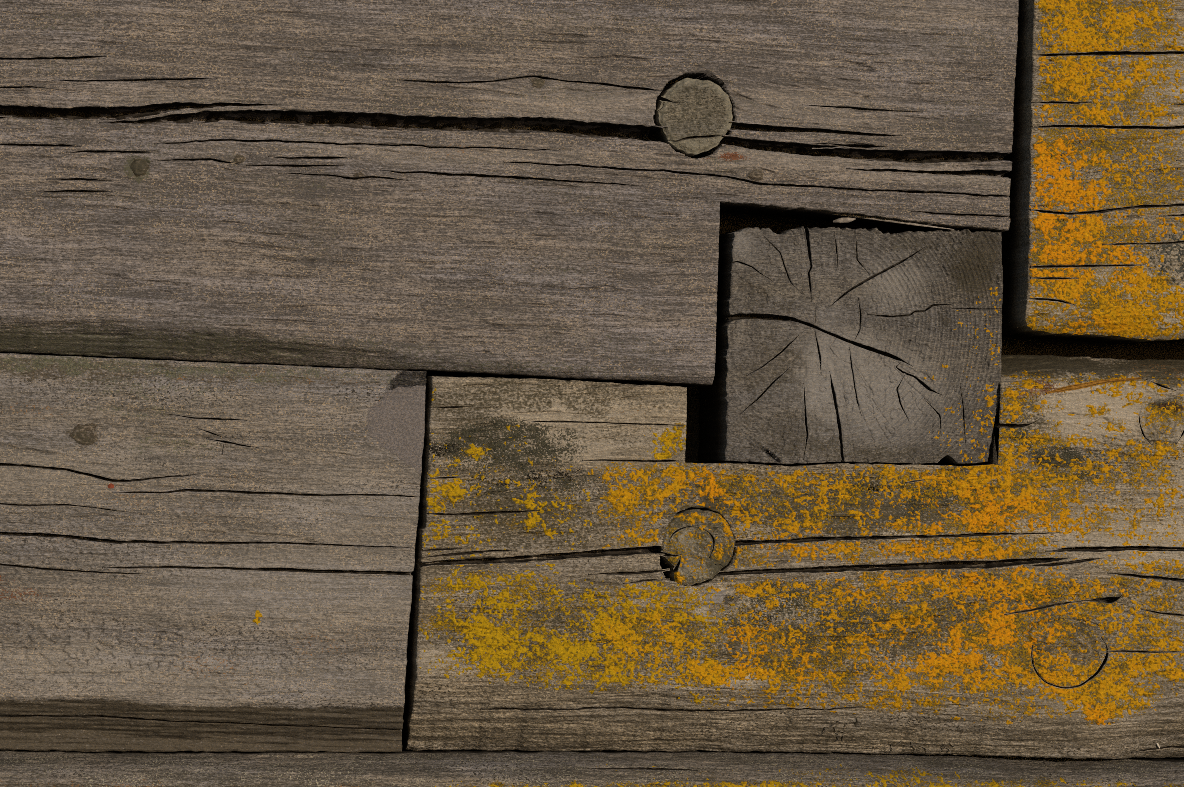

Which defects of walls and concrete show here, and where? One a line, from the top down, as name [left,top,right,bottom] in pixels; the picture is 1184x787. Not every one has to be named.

crack [0,55,216,89]
crack [398,74,679,112]
crack [0,100,1184,306]
crack [728,228,1001,460]
crack [1147,378,1177,392]
crack [169,413,258,454]
crack [431,403,472,411]
crack [523,419,683,427]
crack [996,420,1037,429]
crack [1138,411,1184,445]
crack [583,456,683,464]
crack [0,462,539,576]